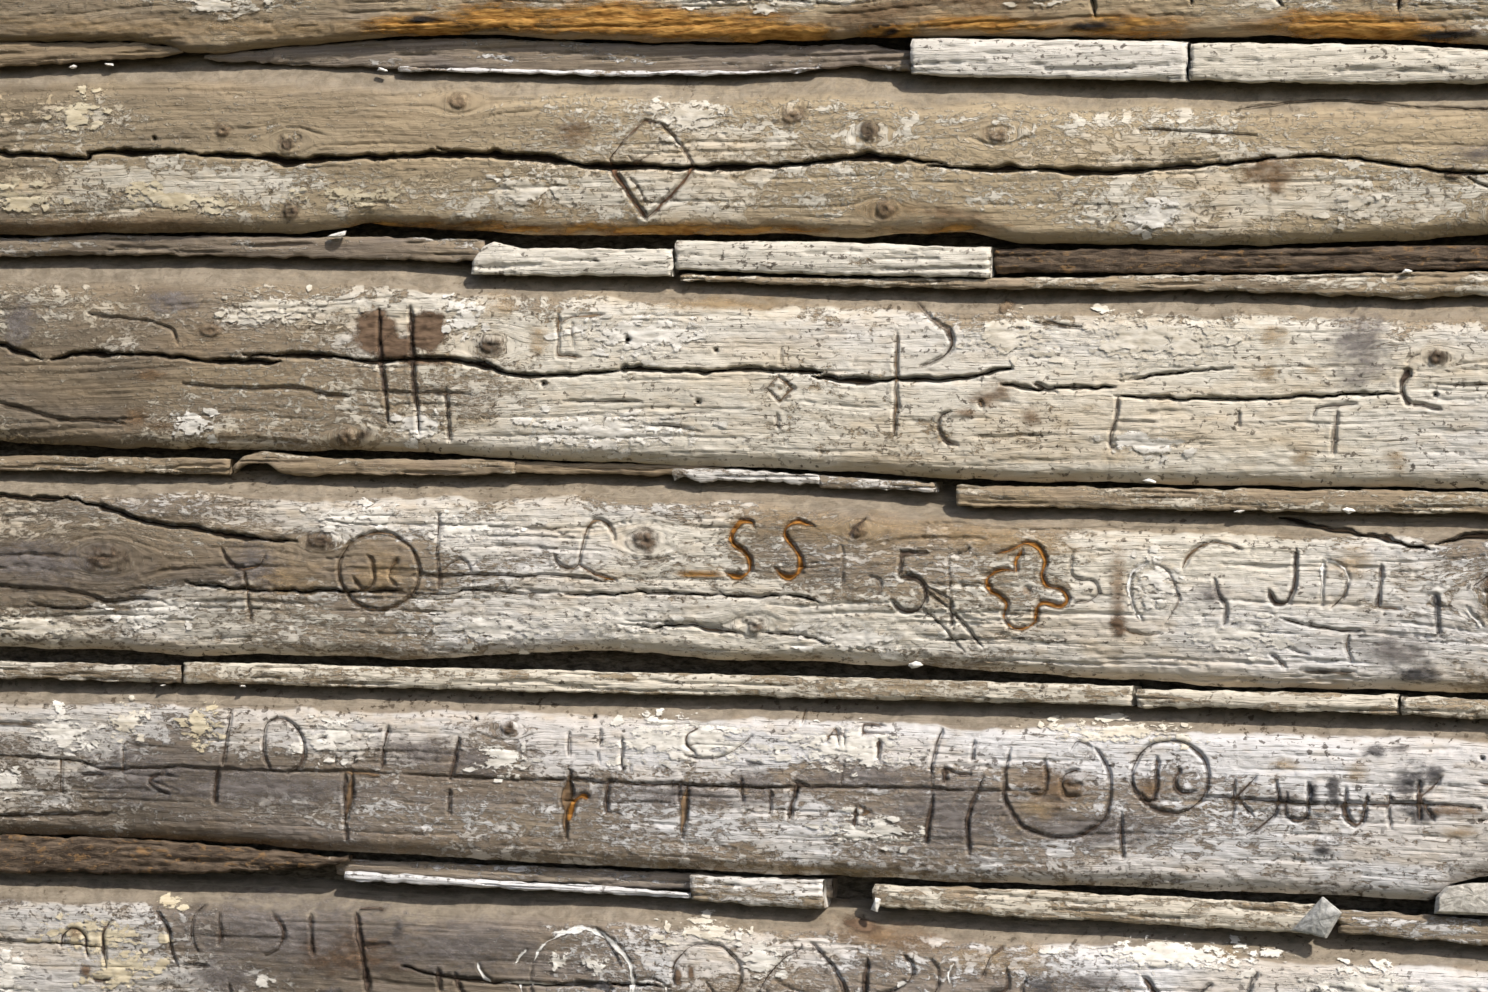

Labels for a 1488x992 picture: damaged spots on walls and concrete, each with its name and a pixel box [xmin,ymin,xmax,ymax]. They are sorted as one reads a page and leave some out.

crack [0,99,1488,187]
crack [0,313,1399,432]
crack [0,494,289,542]
crack [1279,517,1488,550]
crack [1285,619,1361,632]
crack [1303,668,1354,676]
peeling [463,738,543,783]
peeling [600,706,927,777]
peeling [805,805,935,853]
spalling [1292,897,1342,938]
peeling [649,909,793,980]
peeling [1038,934,1428,992]